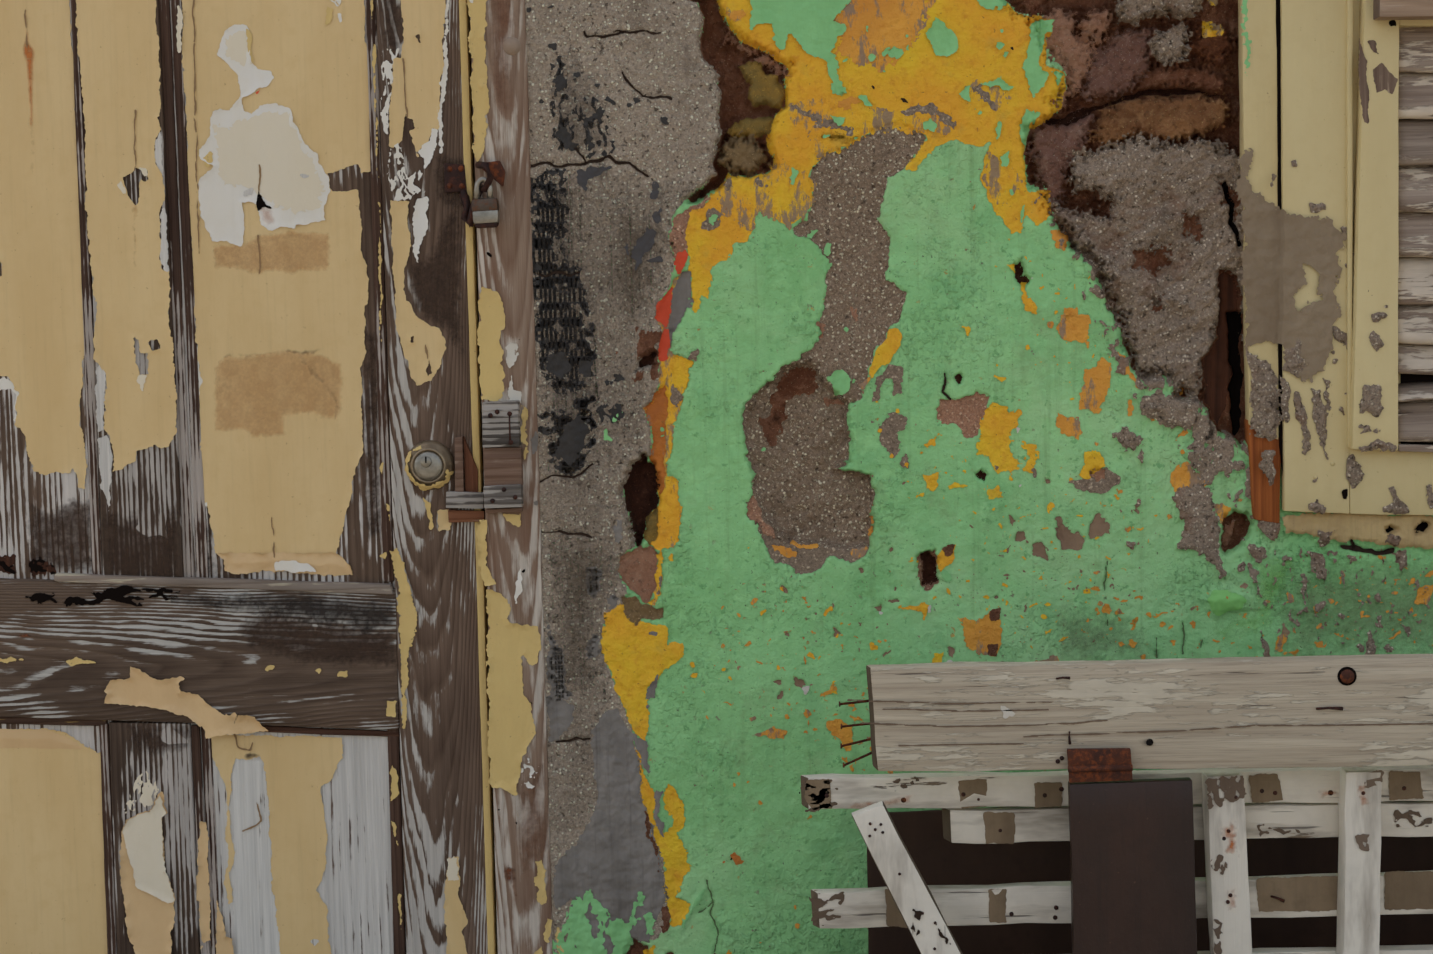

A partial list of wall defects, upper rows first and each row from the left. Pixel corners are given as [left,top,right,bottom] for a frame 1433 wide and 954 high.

peeling [0,0,177,489]
peeling [181,0,371,576]
peeling [477,287,505,401]
crack [531,148,649,177]
crack [583,29,661,38]
crack [622,72,672,100]
crack [1222,181,1241,247]
peeling [476,520,575,796]
peeling [520,0,1433,954]
crack [1340,539,1395,555]
peeling [0,728,175,954]
peeling [104,667,343,954]